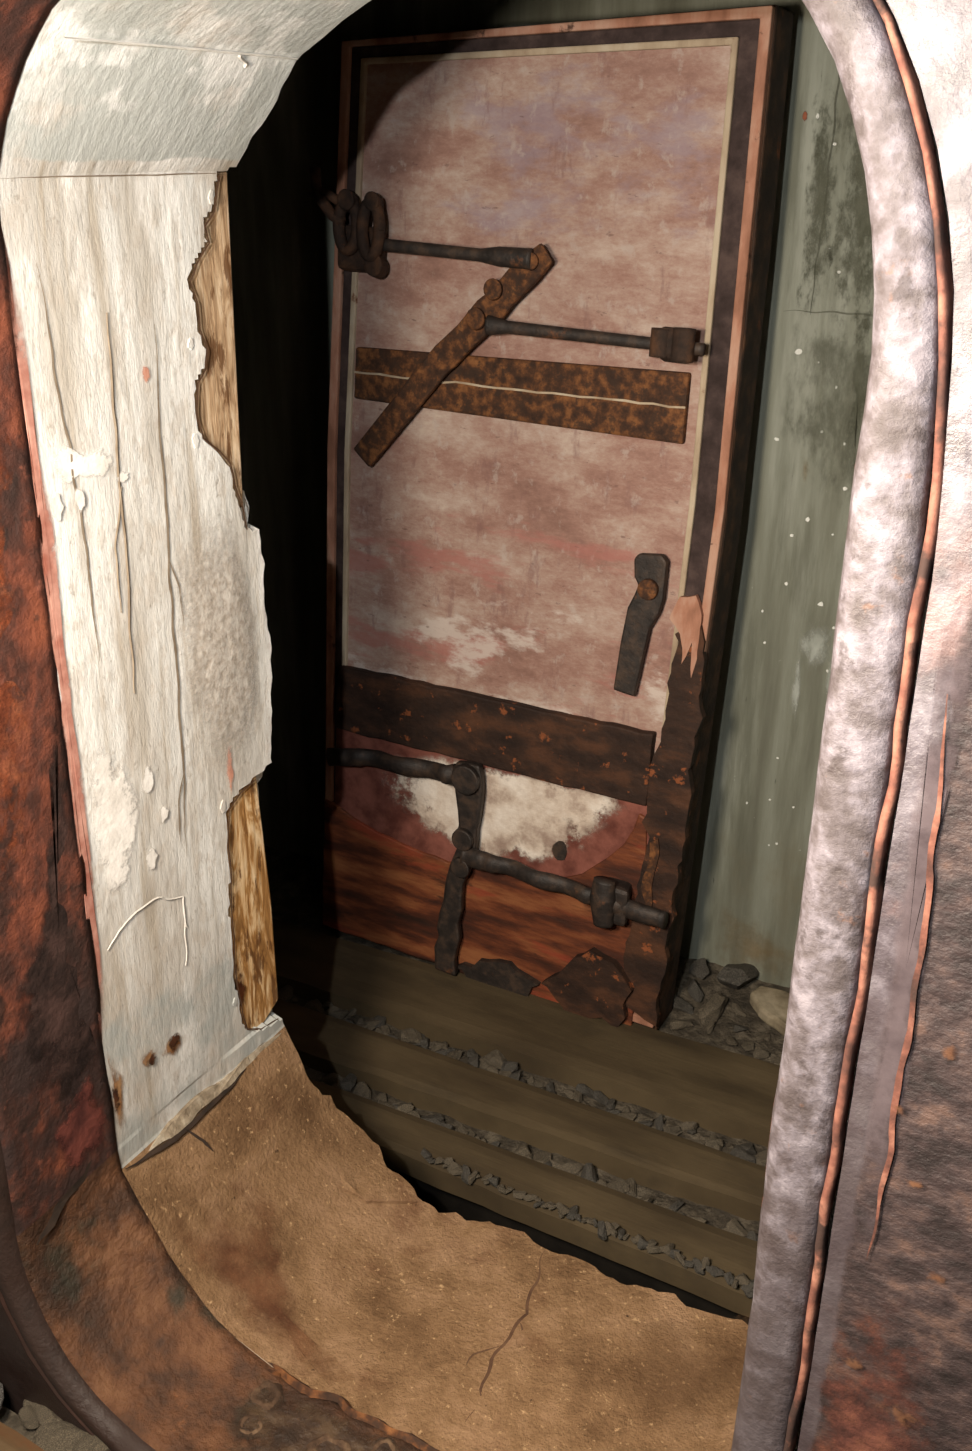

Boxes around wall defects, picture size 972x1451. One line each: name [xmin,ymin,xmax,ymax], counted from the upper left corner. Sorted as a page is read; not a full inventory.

water stain [804,123,873,296]
flaking render [187,172,247,530]
water stain [807,317,869,471]
rust [11,297,101,990]
rust [112,1073,123,1124]
rust [143,1033,181,1066]
flaking render [149,776,281,1151]
rust [812,610,972,1451]
rust [199,1232,313,1356]
crack [465,1250,545,1422]